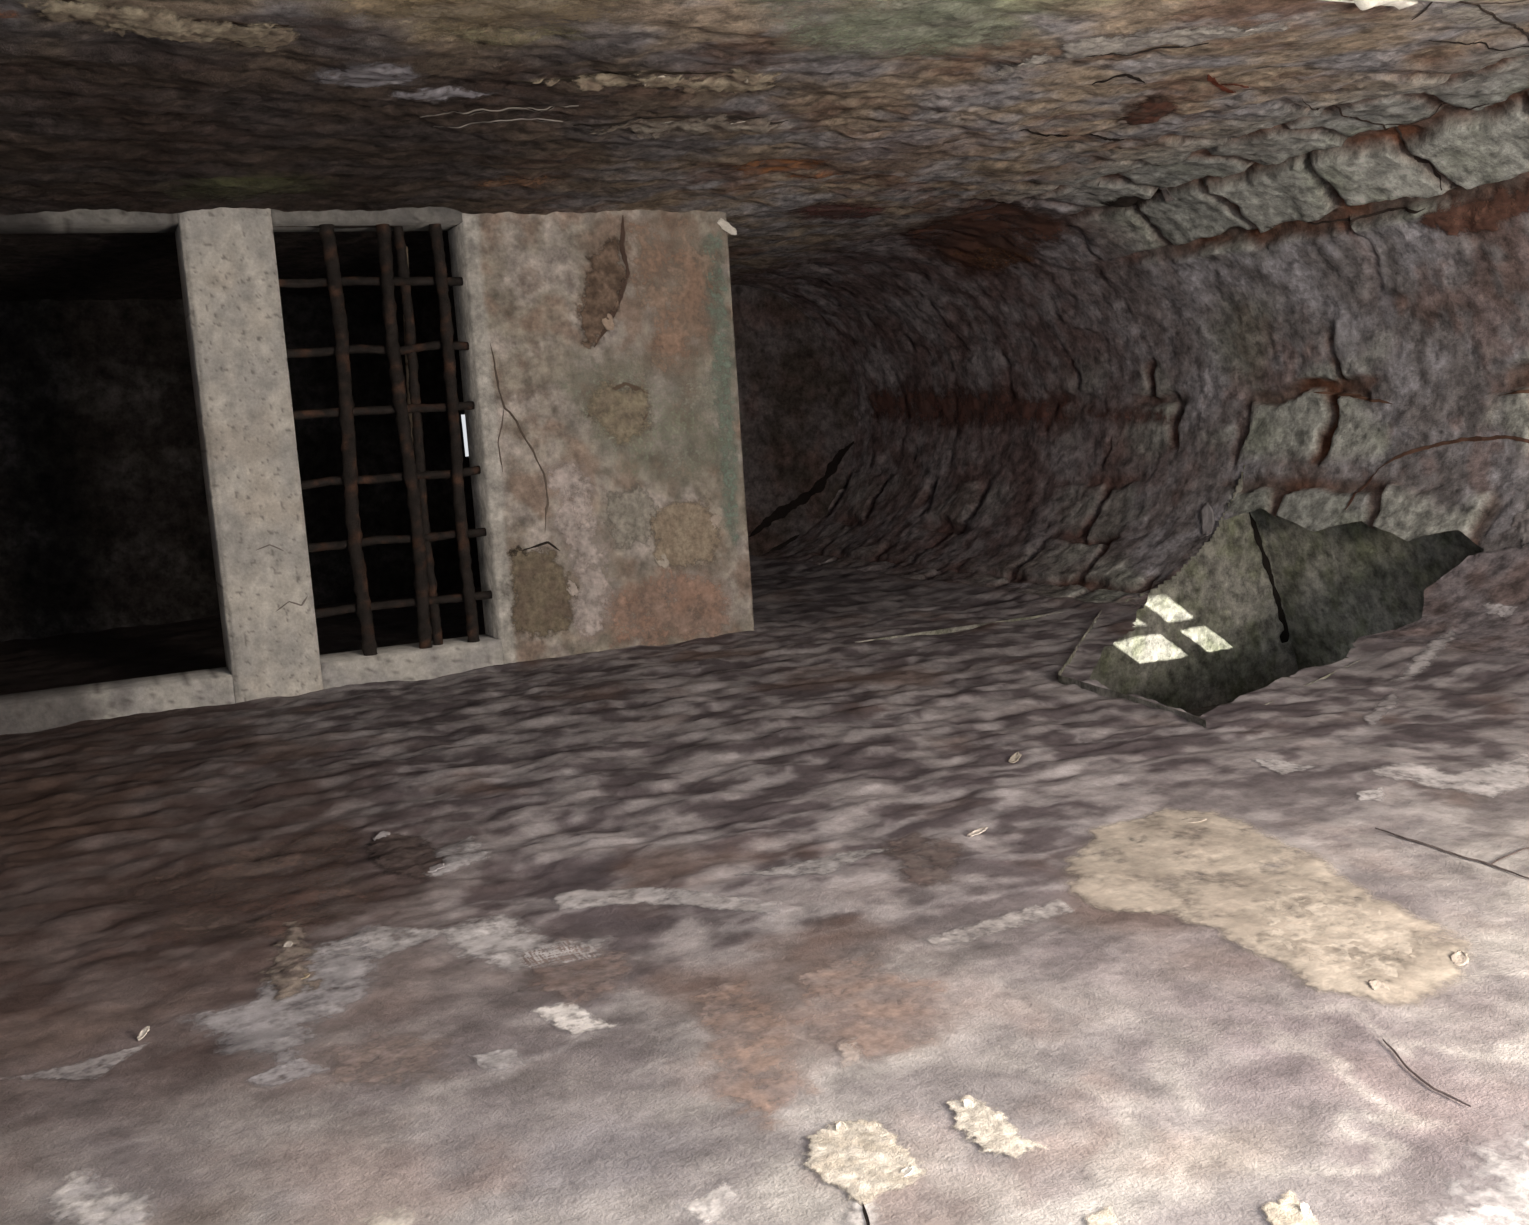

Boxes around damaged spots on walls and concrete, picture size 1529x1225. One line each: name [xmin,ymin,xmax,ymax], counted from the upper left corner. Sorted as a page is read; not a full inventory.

crack [1021,129,1124,141]
crack [1092,73,1145,85]
crack [1207,74,1249,93]
crack [1267,99,1489,228]
flaking render [577,216,630,349]
crack [1314,391,1392,404]
crack [749,441,854,555]
crack [1345,435,1529,510]
crack [1249,512,1289,643]
flaking render [1066,809,1470,1003]
flaking render [803,1119,926,1225]
flaking render [1086,1206,1118,1225]